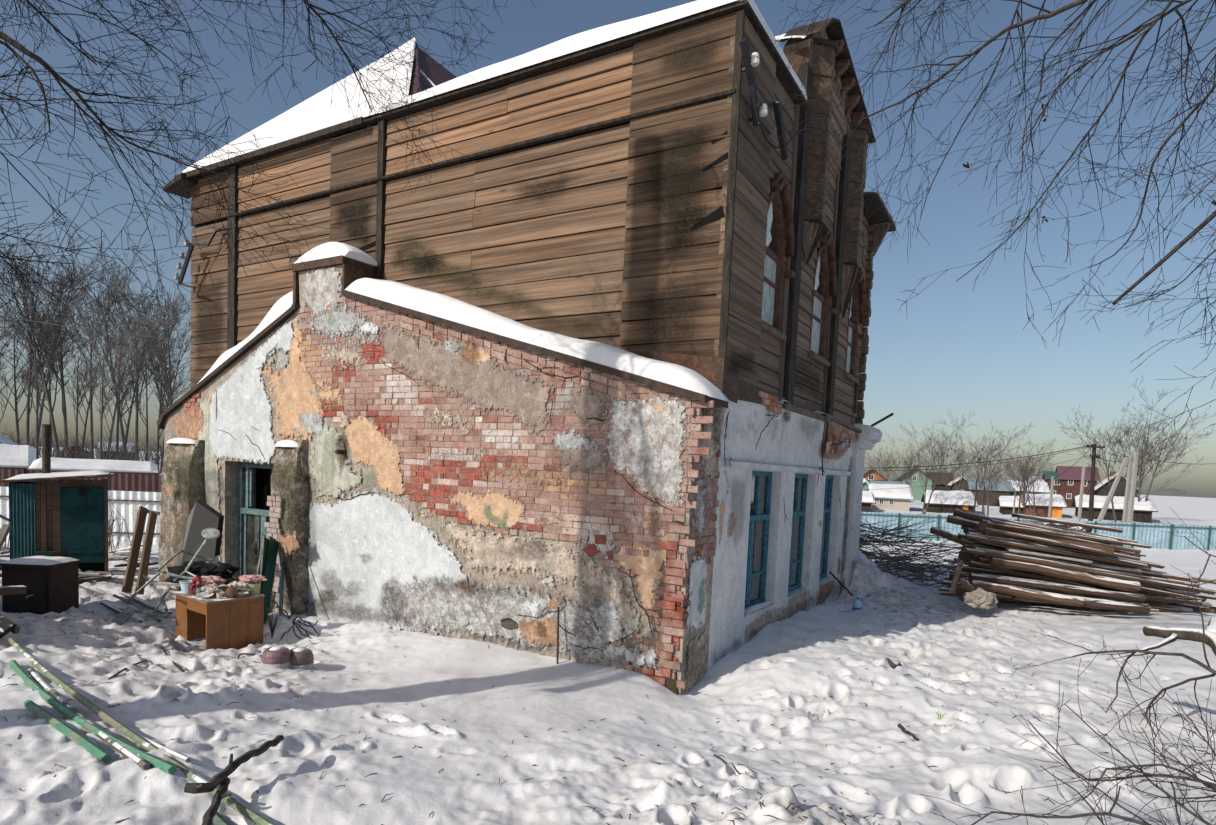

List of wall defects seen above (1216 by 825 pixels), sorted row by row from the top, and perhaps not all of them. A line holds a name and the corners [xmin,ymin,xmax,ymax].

leakage [647,129,705,249]
spalling [261,266,736,695]
spalling [758,391,782,415]
spalling [821,421,858,463]